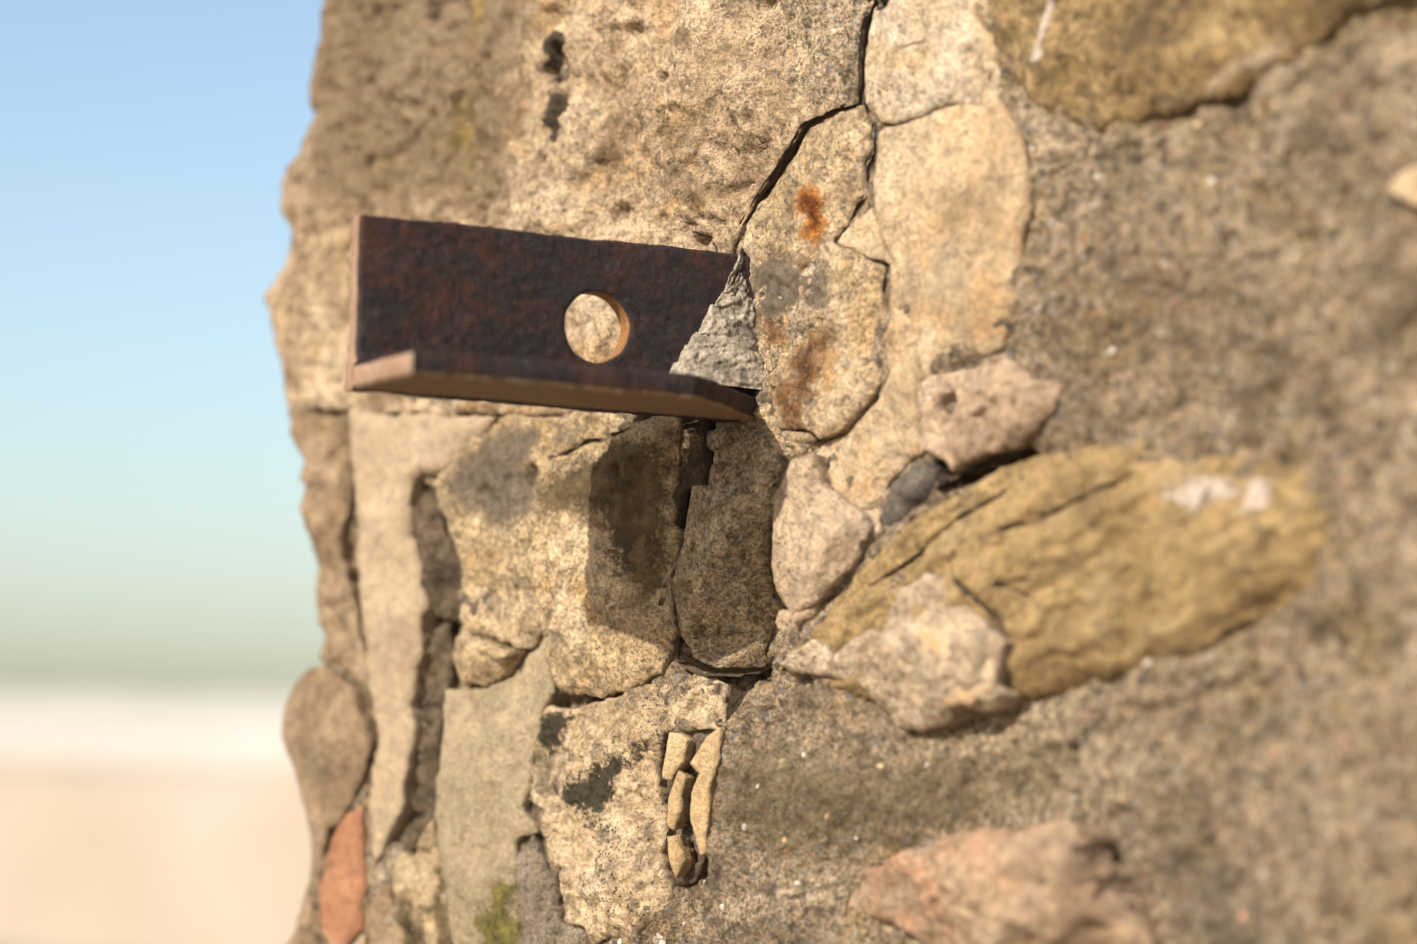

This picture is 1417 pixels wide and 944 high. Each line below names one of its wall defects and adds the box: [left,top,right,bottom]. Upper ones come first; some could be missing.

crack [683,0,879,252]
rust [794,184,828,247]